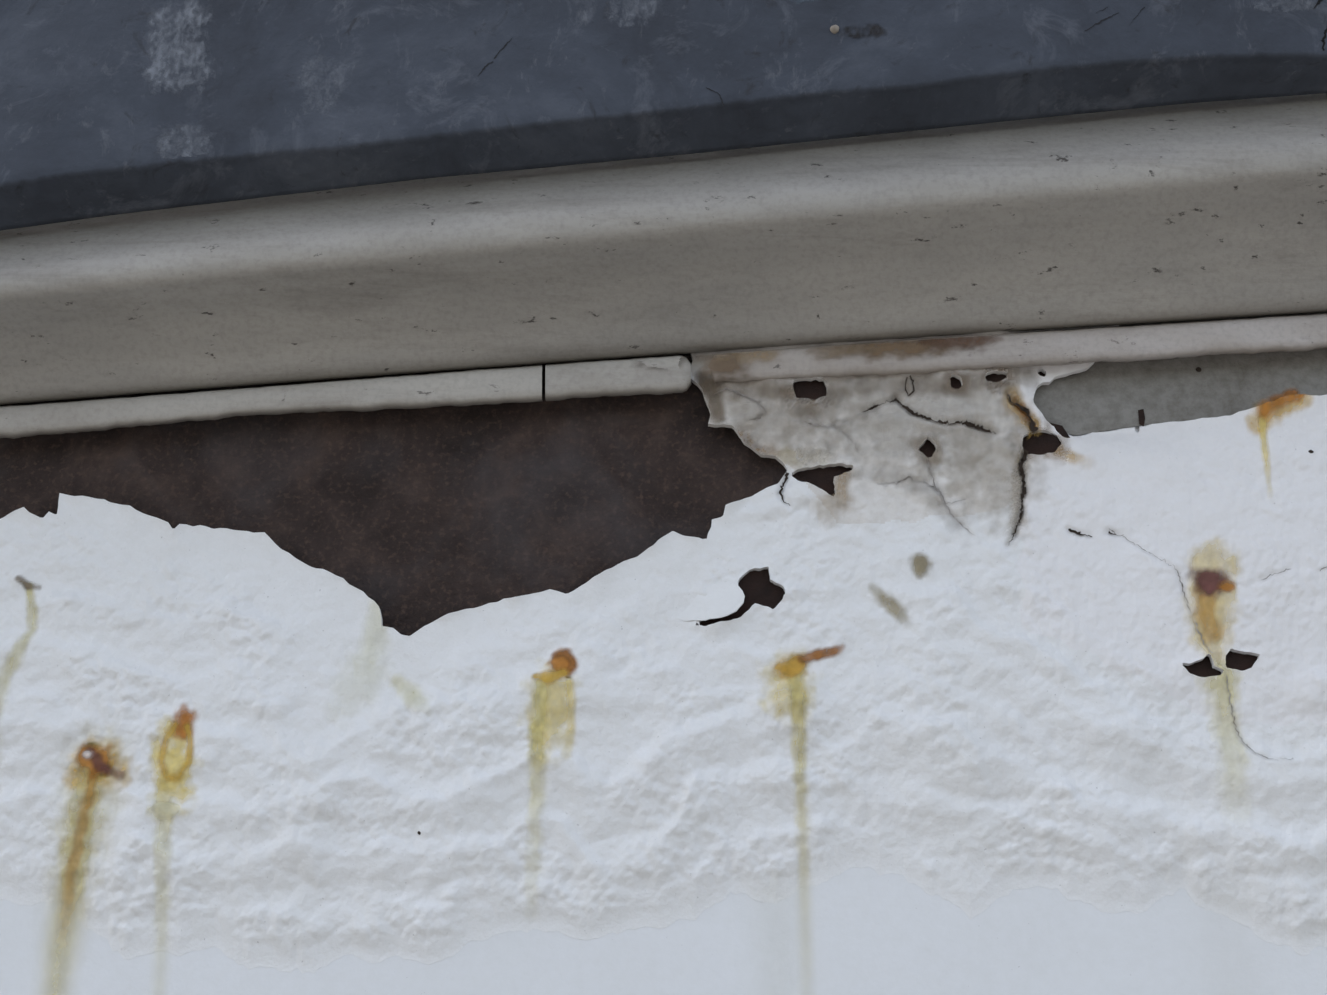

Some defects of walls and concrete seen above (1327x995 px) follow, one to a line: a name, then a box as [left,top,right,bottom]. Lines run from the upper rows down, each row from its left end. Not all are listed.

peeling [1119,312,1327,326]
crack [802,375,996,455]
peeling [1033,348,1327,435]
peeling [0,353,787,636]
crack [779,472,789,504]
crack [881,458,974,535]
crack [1007,394,1038,542]
rust [1192,547,1235,688]
rust [533,649,575,742]
rust [775,647,840,714]
rust [153,708,194,817]
rust [63,746,115,904]